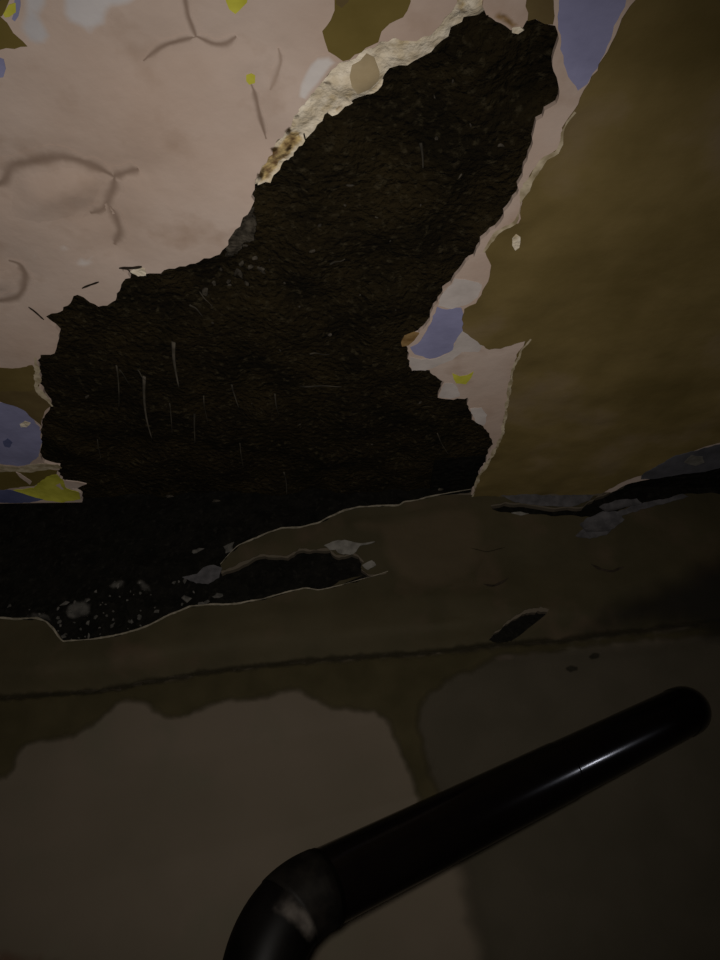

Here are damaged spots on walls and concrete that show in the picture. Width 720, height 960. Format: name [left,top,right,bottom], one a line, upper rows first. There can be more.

crack [142,0,238,62]
crack [249,48,285,139]
crack [0,145,142,270]
crack [0,259,44,320]
flaking render [0,0,720,696]
crack [0,620,720,700]
leakage [0,625,720,960]